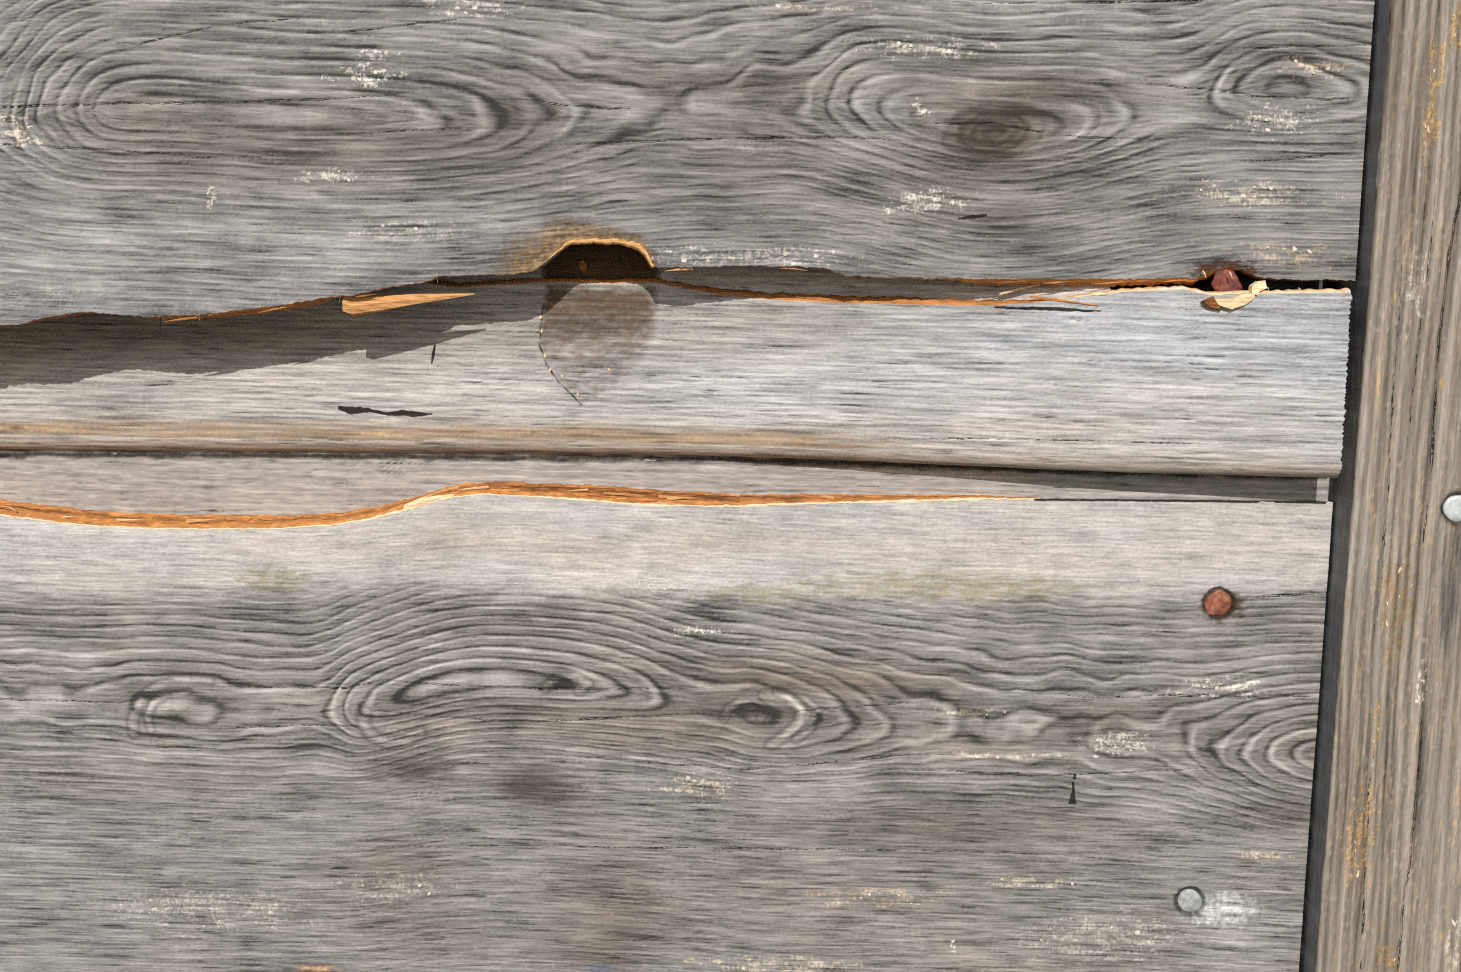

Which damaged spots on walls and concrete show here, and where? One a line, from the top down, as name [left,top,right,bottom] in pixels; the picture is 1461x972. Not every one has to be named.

crack [0,251,1352,333]
rust [1192,259,1255,276]
leakage [539,286,652,399]
crack [0,437,1329,530]
rust [1210,590,1245,620]